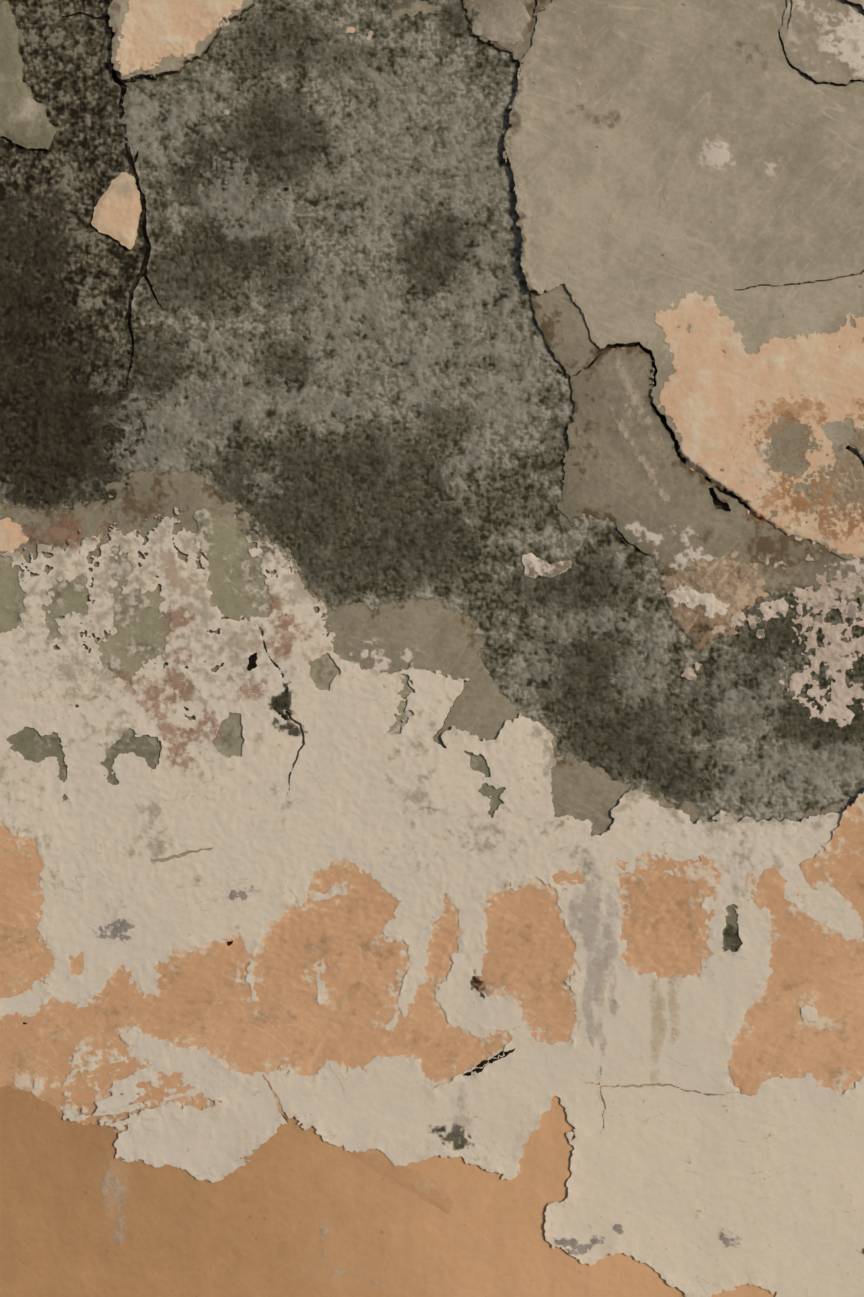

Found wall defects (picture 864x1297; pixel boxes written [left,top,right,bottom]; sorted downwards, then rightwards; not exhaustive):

damp [118,74,230,173]
crack [111,0,254,385]
damp [0,195,540,547]
damp [310,58,506,245]
spalling [0,0,864,822]
crack [735,270,864,290]
crack [778,31,864,86]
damp [240,681,307,736]
crack [286,719,304,796]
peeling [608,851,743,980]
peeling [727,792,864,1094]
peeling [0,821,687,1297]